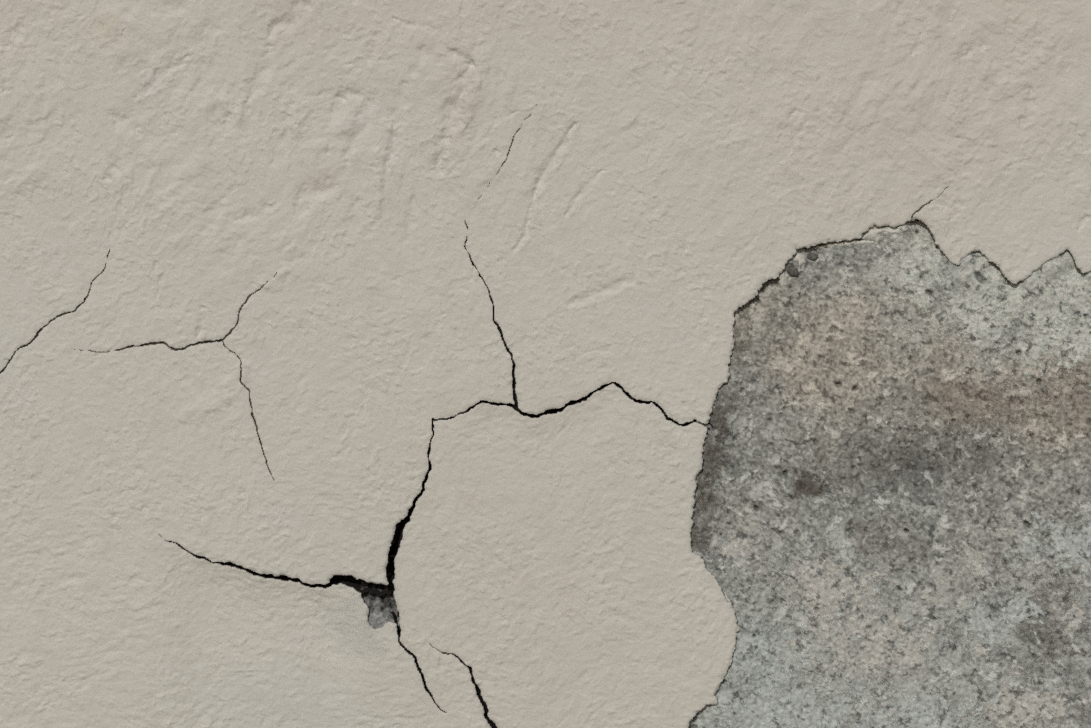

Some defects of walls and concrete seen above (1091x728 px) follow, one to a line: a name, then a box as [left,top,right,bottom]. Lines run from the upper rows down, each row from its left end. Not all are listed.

crack [479,104,537,198]
crack [0,249,110,374]
crack [74,272,277,481]
crack [158,223,713,728]
spalling [688,219,1091,728]